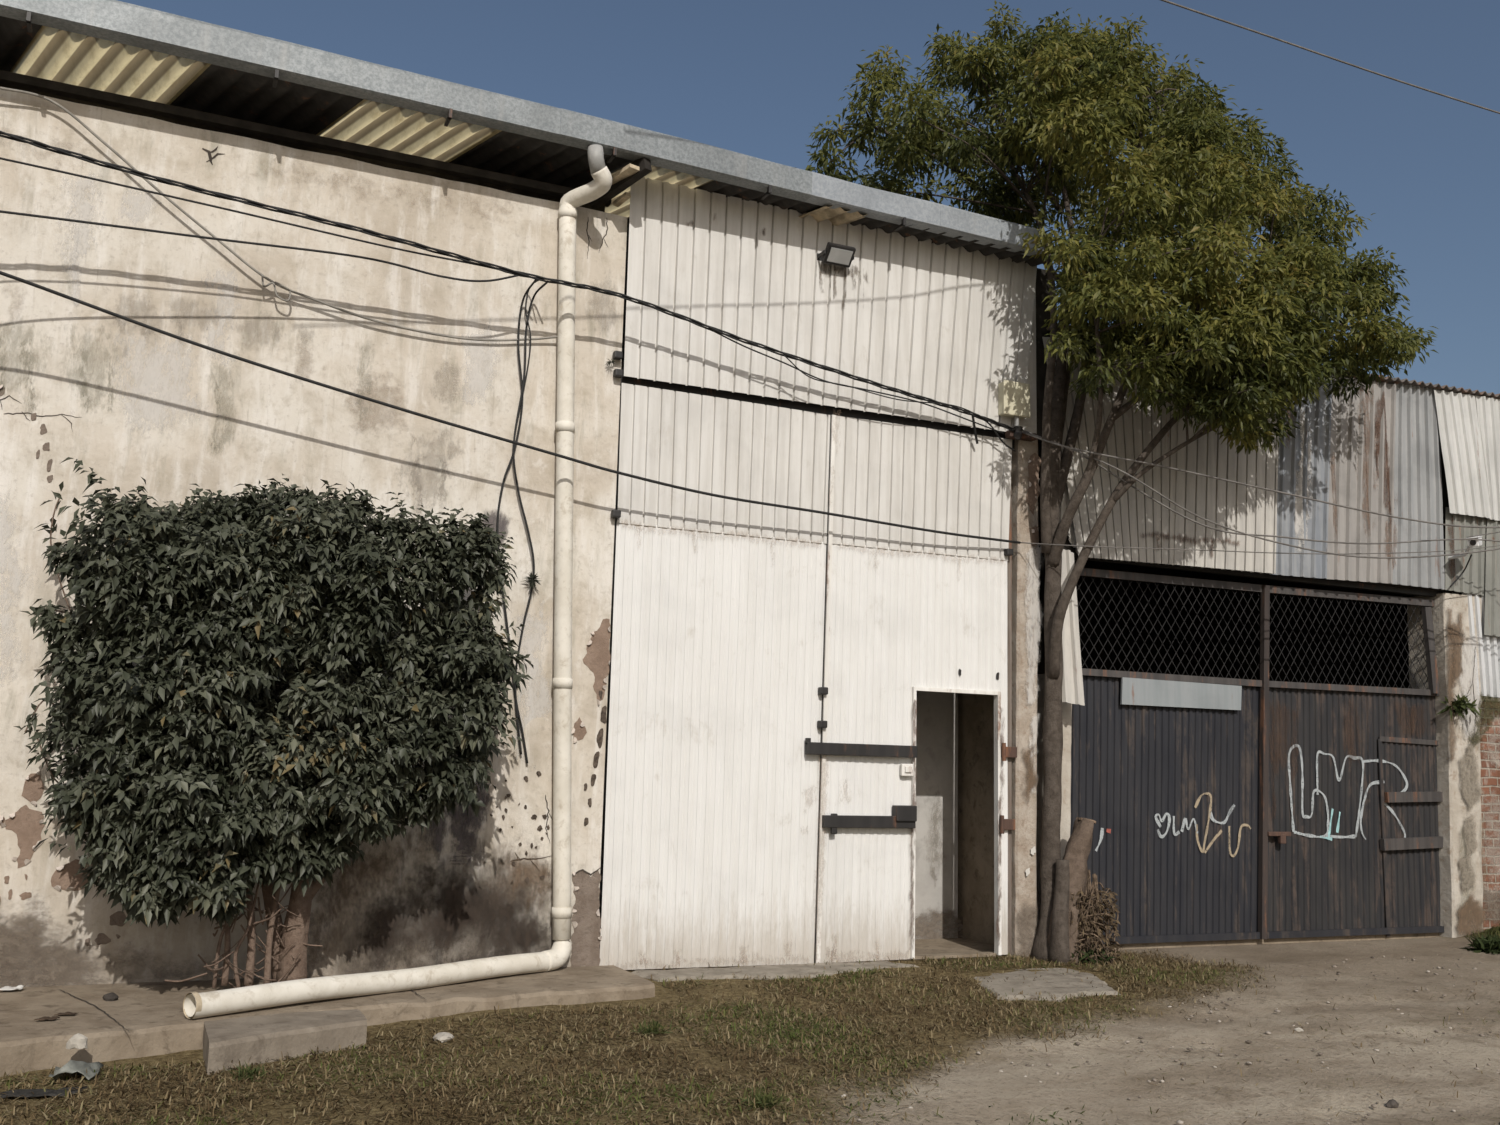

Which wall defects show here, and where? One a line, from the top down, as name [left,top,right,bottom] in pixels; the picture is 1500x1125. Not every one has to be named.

rust [1375,392,1395,521]
damp [517,611,550,757]
peeling [571,618,611,826]
peeling [0,771,45,902]
peeling [51,859,92,892]
damp [310,842,411,951]
damp [346,771,553,973]
spalling [570,867,602,967]